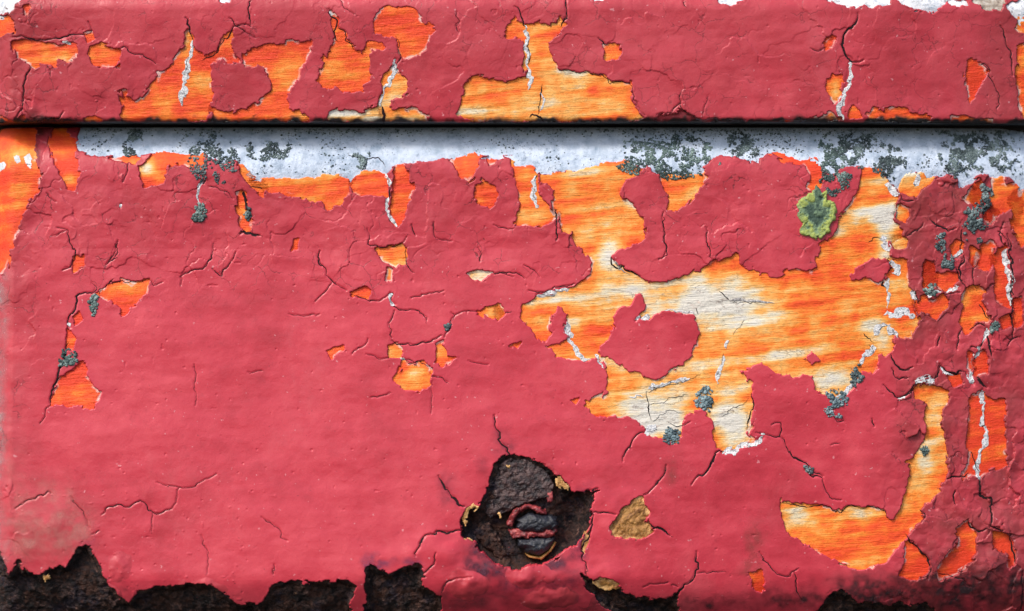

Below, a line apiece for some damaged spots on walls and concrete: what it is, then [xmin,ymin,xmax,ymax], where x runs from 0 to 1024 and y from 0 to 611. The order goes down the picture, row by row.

peeling [119,6,435,122]
peeling [456,17,643,121]
peeling [828,0,1024,118]
peeling [0,115,81,274]
crack [530,173,558,238]
crack [41,180,262,422]
crack [290,155,470,408]
crack [478,248,572,298]
crack [563,322,603,368]
peeling [511,159,1024,453]
peeling [780,350,988,581]
corrosion [470,545,501,577]